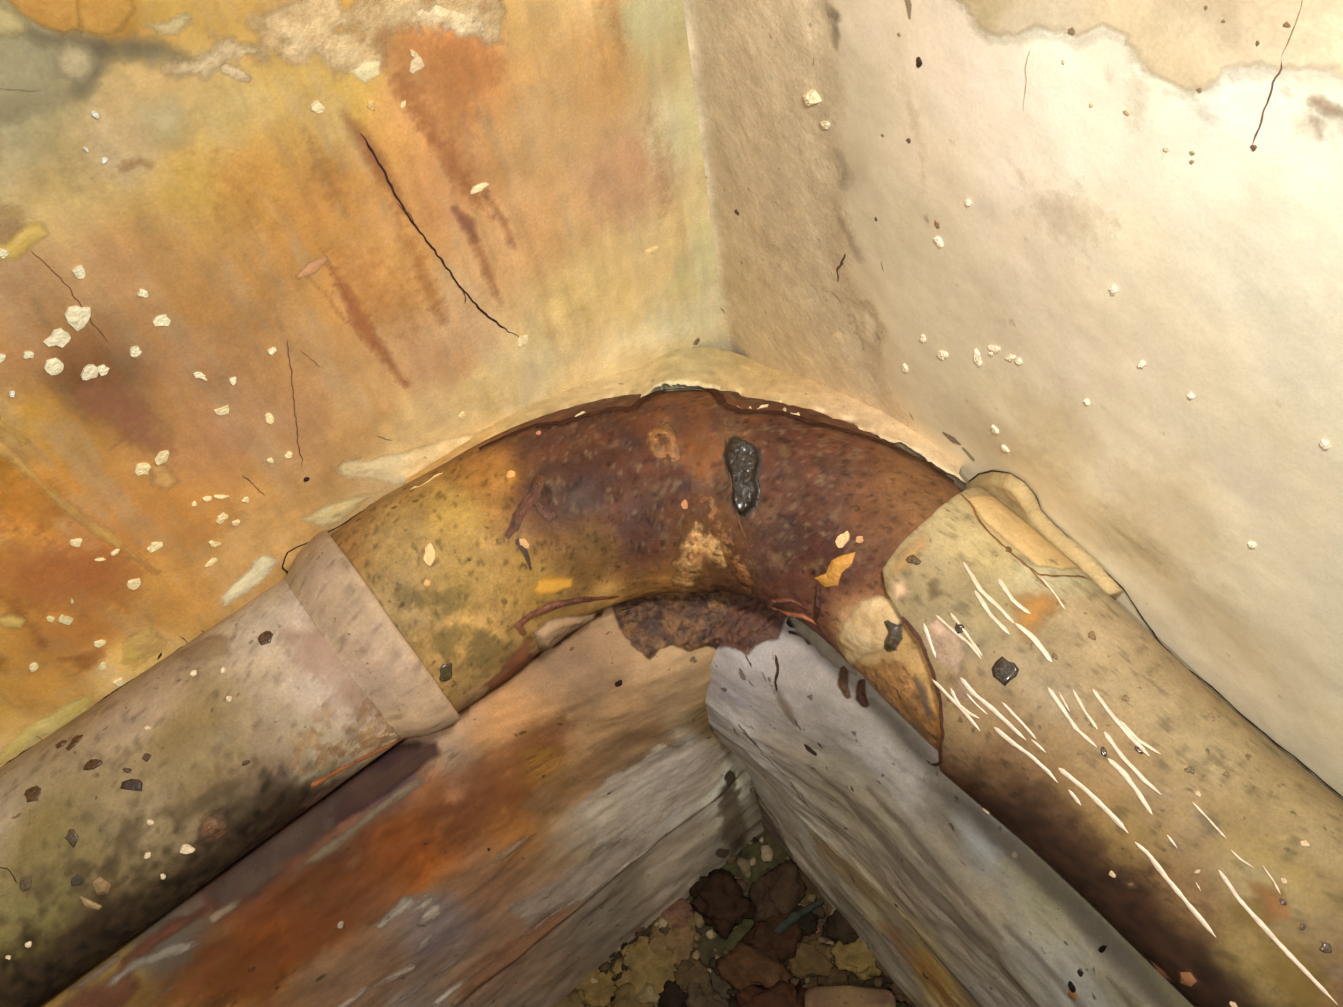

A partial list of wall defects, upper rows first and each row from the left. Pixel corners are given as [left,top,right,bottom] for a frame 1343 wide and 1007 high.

peeling [408,49,425,74]
peeling [959,0,1343,93]
crack [1250,0,1303,151]
crack [361,134,519,337]
rust [455,210,476,238]
leakage [23,306,91,375]
leakage [81,364,110,380]
leakage [153,314,171,327]
rust [340,284,390,362]
leakage [134,450,178,490]
leakage [191,495,249,527]
rust [123,738,438,961]